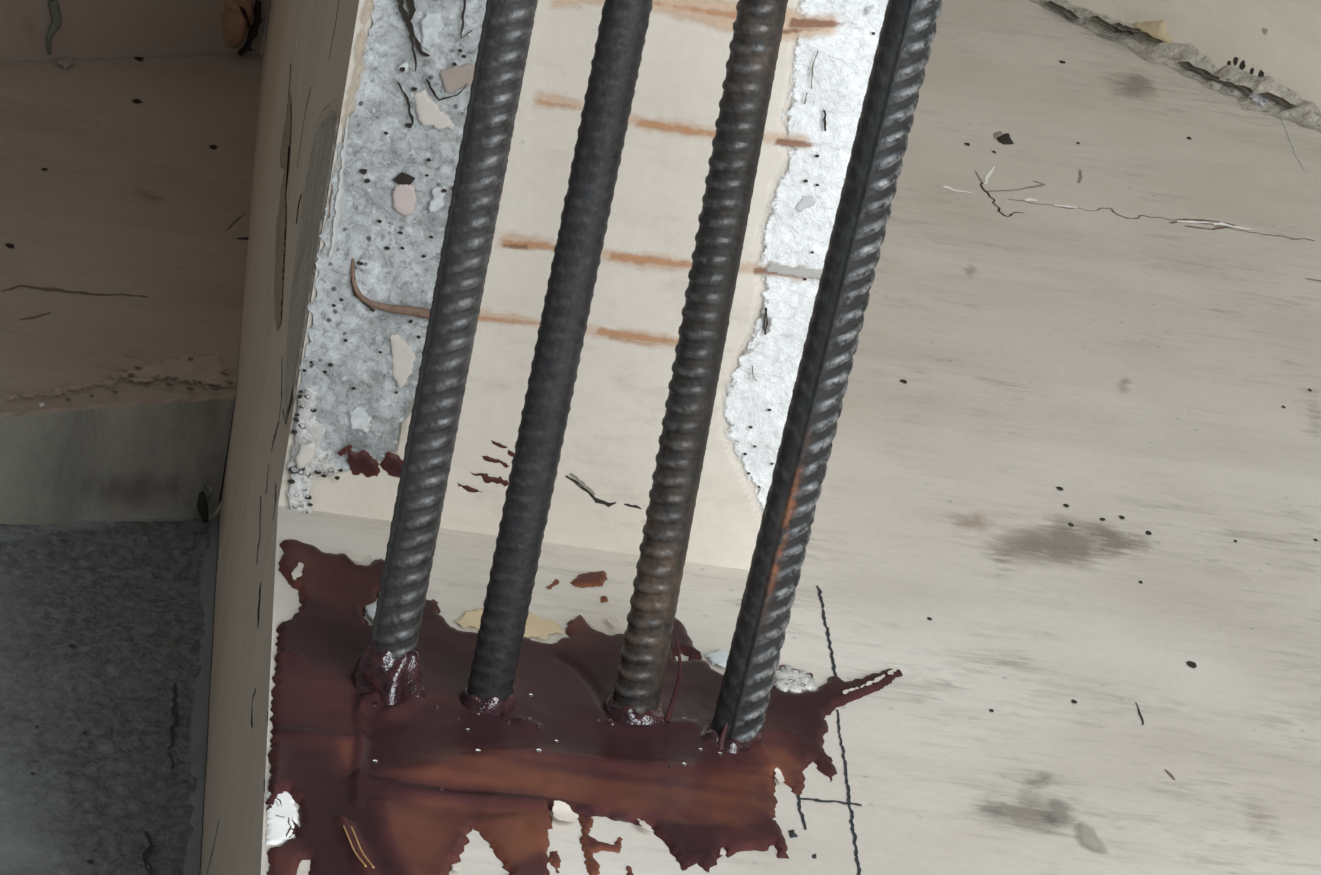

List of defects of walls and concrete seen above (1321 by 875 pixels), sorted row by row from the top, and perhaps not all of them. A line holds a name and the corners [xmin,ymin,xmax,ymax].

rust [652,0,738,30]
rust [782,10,840,37]
peeling [1130,20,1173,43]
rust [628,116,716,136]
rust [763,137,812,147]
crack [975,169,1315,241]
spalling [285,0,487,513]
rust [601,252,692,268]
spalling [724,0,888,511]
rust [586,328,678,345]
spalling [5,354,237,407]
peeling [482,440,515,468]